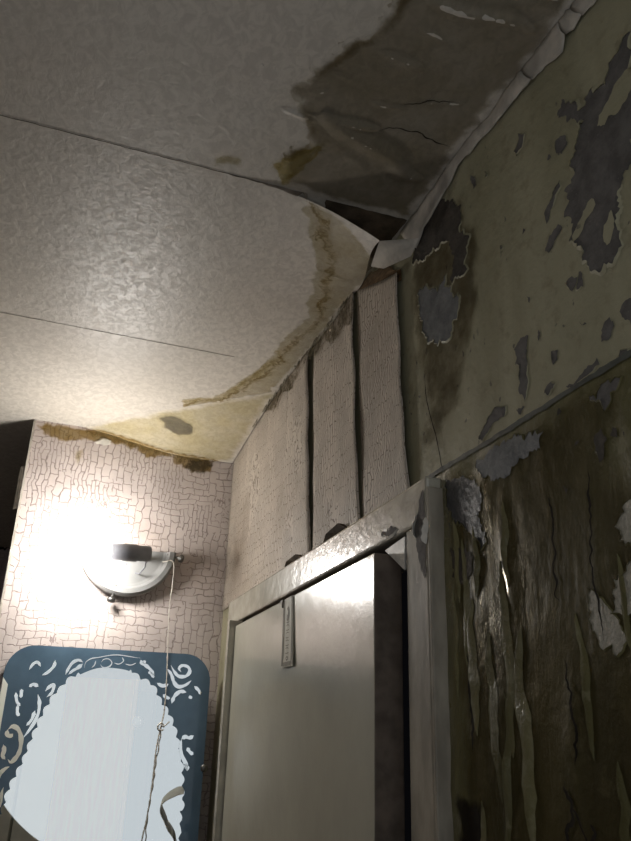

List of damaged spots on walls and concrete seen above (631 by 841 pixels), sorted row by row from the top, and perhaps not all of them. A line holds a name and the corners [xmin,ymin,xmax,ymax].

peeling [544,31,631,292]
peeling [412,197,471,346]
peeling [620,298,631,323]
peeling [514,335,529,415]
peeling [478,405,507,442]
peeling [615,500,631,546]
peeling [445,429,543,841]
peeling [574,554,631,761]
damp [458,803,481,841]